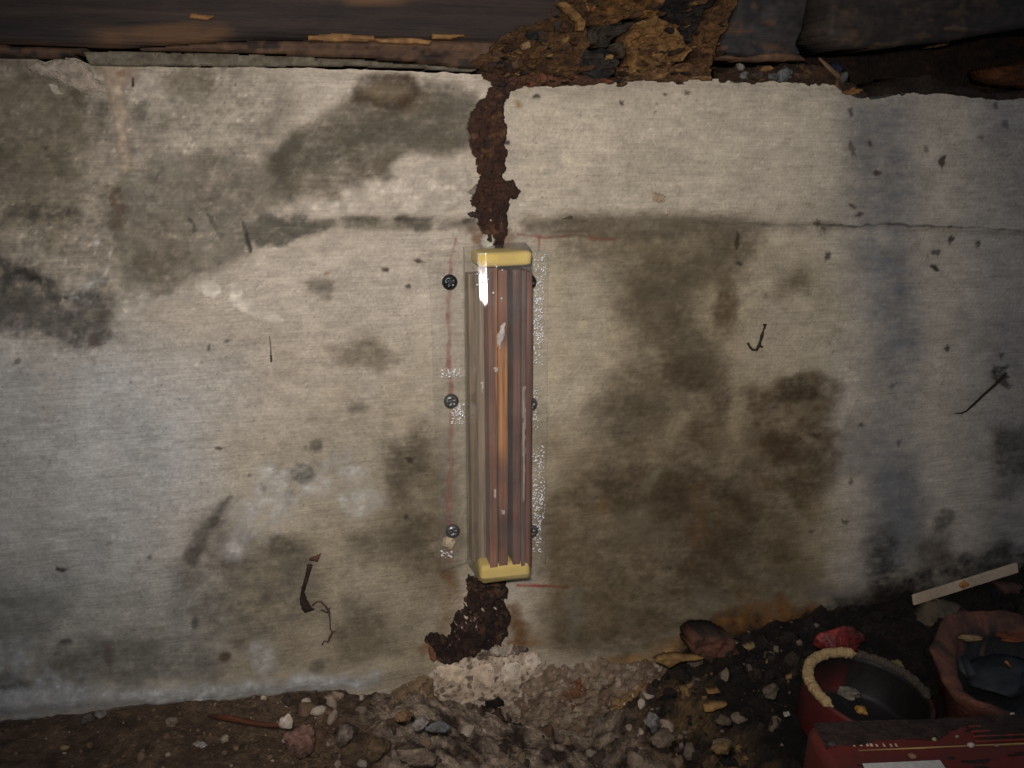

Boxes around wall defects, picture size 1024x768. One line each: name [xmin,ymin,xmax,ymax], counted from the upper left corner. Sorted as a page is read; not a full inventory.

water stain [83,51,476,255]
water stain [0,240,284,345]
water stain [567,217,751,435]
water stain [554,374,835,643]
water stain [816,523,1024,612]